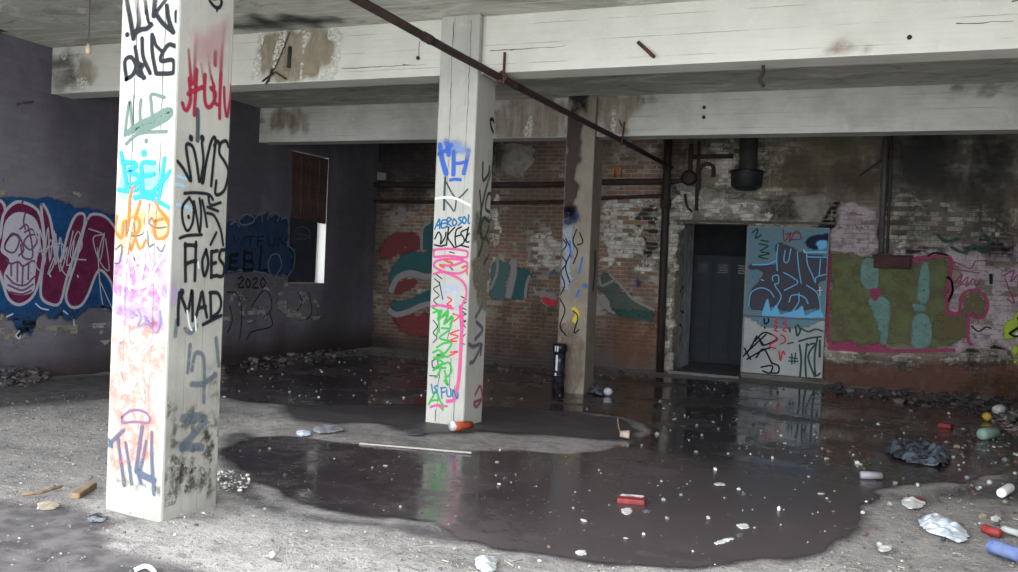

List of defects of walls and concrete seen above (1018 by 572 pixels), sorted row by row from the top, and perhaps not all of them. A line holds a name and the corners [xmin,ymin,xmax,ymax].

peeling [489,194,502,282]
peeling [526,231,562,271]